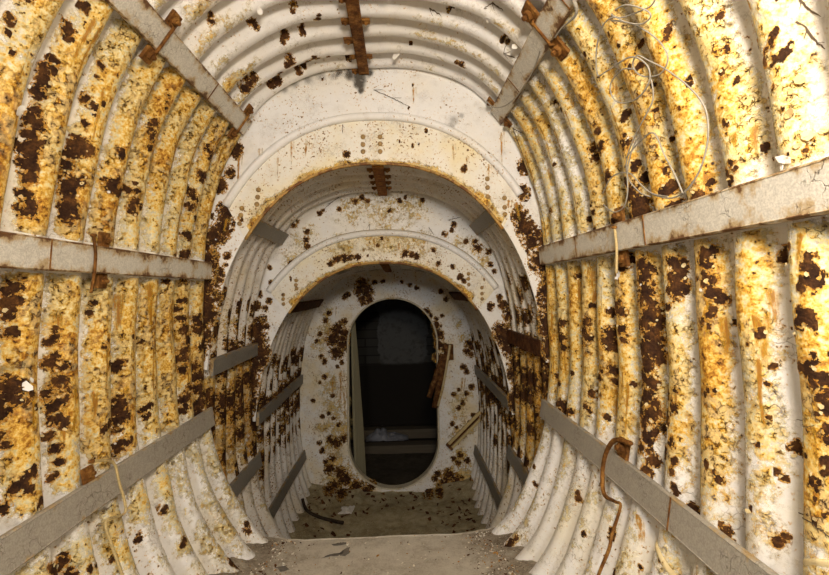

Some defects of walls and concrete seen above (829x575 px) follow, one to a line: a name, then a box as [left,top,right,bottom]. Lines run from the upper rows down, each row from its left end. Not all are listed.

rust [0,0,242,259]
rust [222,62,256,106]
rust [500,0,829,246]
rust [238,158,504,230]
rust [289,192,474,306]
peeling [776,241,791,264]
peeling [793,248,826,339]
rust [316,373,362,489]
rust [506,220,829,575]
peeling [797,351,829,478]